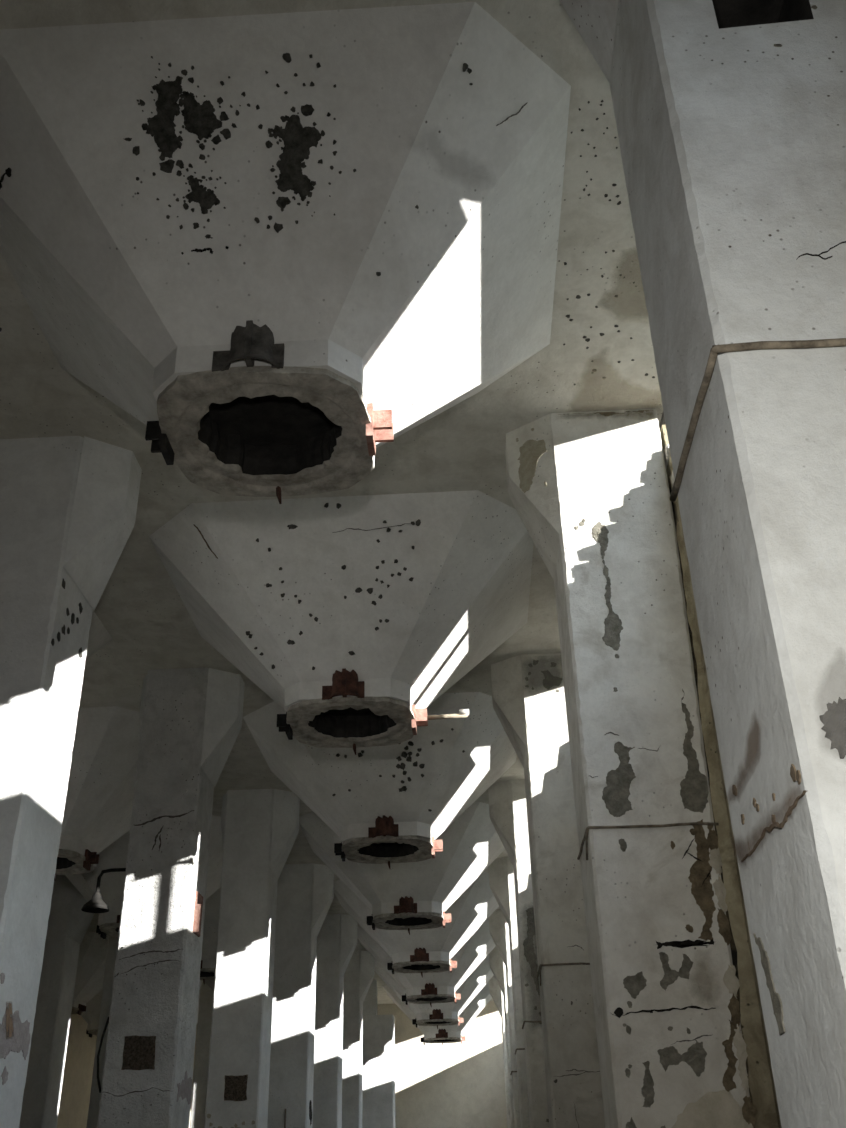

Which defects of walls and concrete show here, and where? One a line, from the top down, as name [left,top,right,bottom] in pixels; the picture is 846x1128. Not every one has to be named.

peeling [137,56,260,239]
peeling [254,104,356,233]
crack [796,241,846,260]
peeling [516,428,547,493]
crack [332,519,421,533]
peeling [574,519,623,658]
peeling [602,741,636,817]
crack [611,475,808,1128]
spalling [623,689,732,1008]
crack [114,949,180,978]
peeling [0,1010,30,1085]
spalling [625,1028,707,1108]